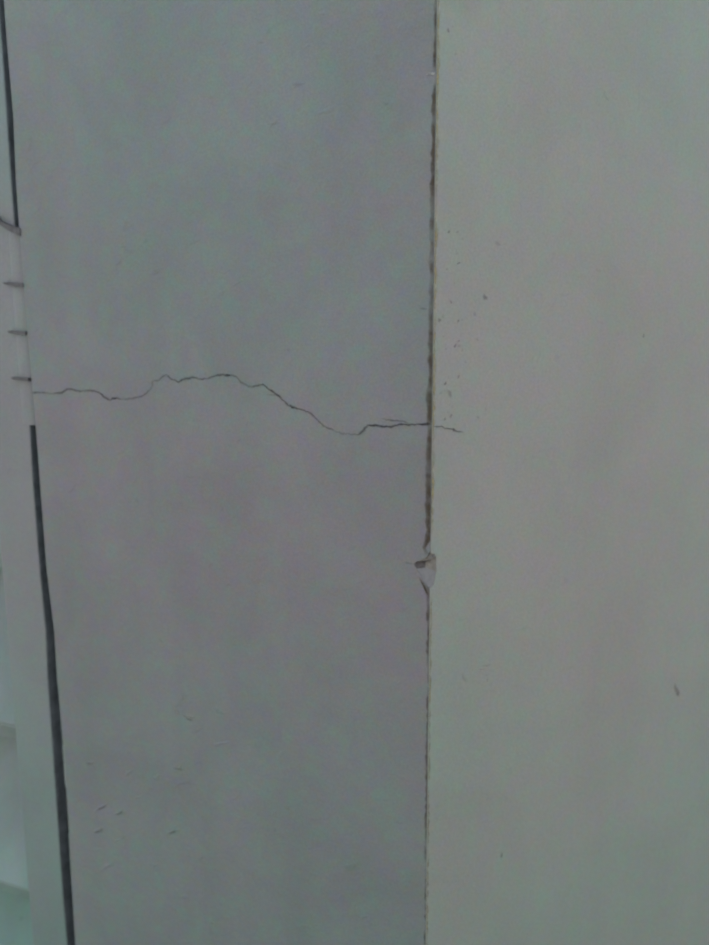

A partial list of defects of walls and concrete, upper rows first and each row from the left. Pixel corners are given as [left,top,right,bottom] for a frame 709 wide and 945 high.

spalling [414,553,436,592]